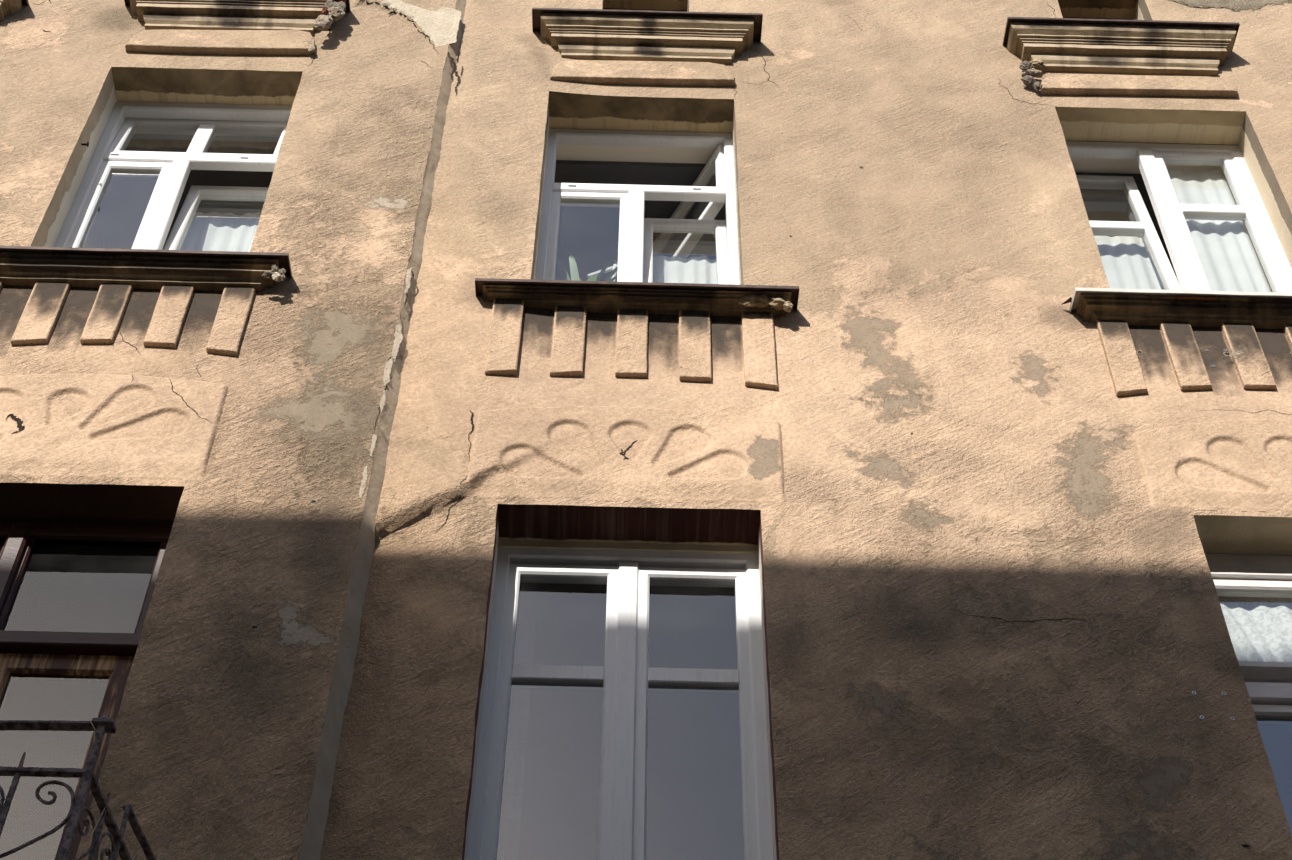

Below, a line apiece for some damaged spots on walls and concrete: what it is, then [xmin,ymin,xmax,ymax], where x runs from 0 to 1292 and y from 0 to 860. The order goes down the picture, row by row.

crack [355,0,460,83]
flaking render [376,0,462,47]
crack [436,411,474,532]